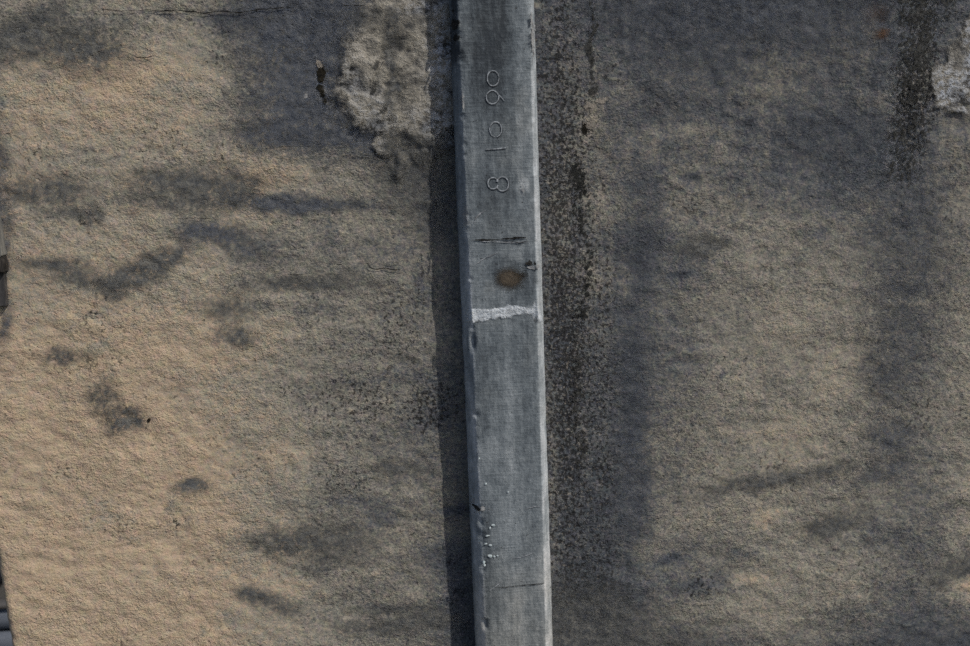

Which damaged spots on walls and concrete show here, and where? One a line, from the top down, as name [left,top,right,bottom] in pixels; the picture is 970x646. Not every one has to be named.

water stain [240,0,455,230]
water stain [585,1,599,98]
water stain [886,0,957,181]
water stain [0,145,102,251]
water stain [133,170,345,216]
water stain [26,222,259,301]
water stain [262,272,355,290]
water stain [569,162,595,468]